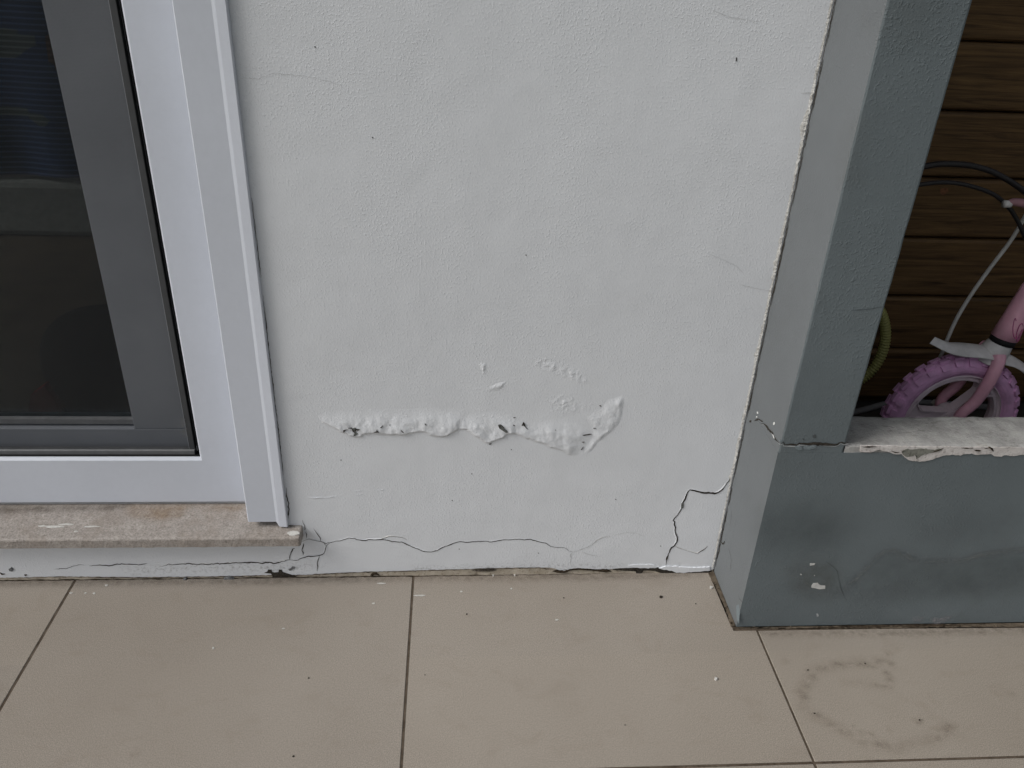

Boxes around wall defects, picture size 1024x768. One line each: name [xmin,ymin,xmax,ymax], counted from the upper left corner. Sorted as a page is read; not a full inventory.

crack [0,300,730,581]
crack [749,418,849,447]
spalling [860,445,1024,462]